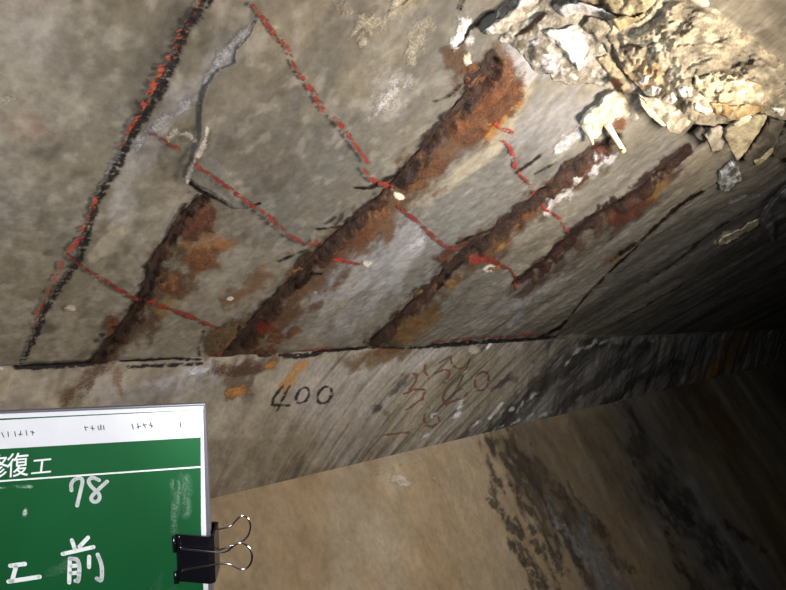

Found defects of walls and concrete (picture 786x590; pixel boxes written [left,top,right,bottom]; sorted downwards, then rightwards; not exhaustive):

corrosion [60,221,232,406]
crack [165,181,262,239]
crack [279,249,322,291]
crack [317,216,341,231]
corrosion [205,42,524,400]
crack [355,154,417,190]
corrosion [346,133,622,372]
crack [516,154,553,174]
spalling [512,143,693,285]
corrosion [573,168,682,255]
leakage [471,338,661,590]